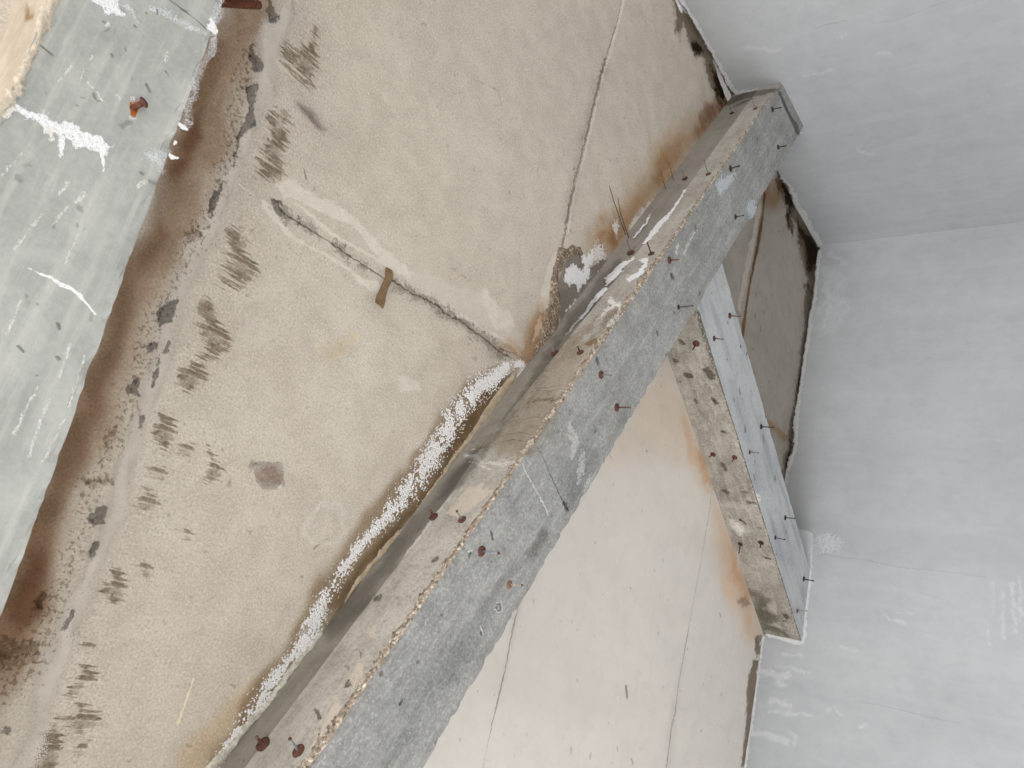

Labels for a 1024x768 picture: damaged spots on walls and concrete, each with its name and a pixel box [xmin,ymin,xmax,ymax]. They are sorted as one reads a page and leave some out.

leakage [181,0,226,128]
leakage [0,100,115,172]
crack [566,0,625,234]
leakage [26,266,97,315]
leakage [262,200,390,293]
leakage [532,291,550,345]
leakage [563,239,648,343]
leakage [612,190,704,244]
leakage [778,183,818,277]
spalling [296,96,770,768]
leakage [206,310,526,768]